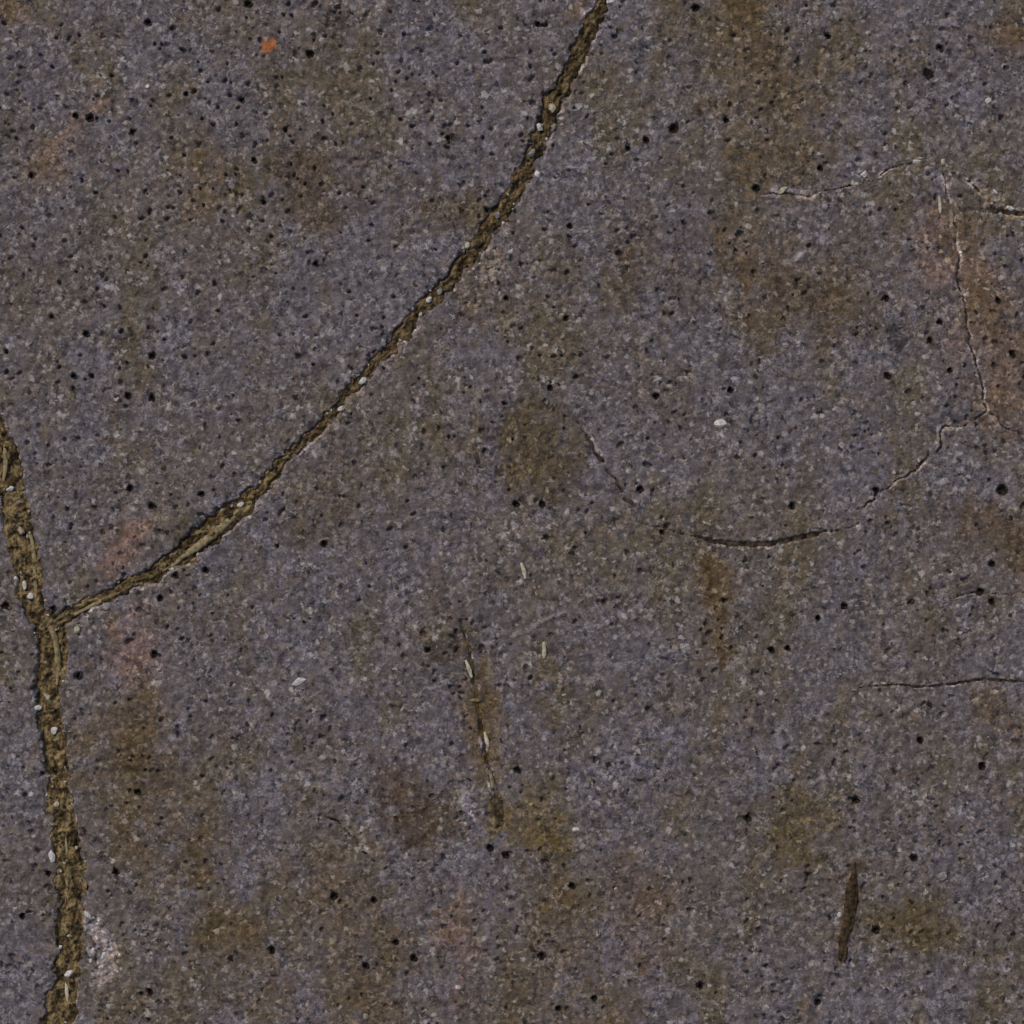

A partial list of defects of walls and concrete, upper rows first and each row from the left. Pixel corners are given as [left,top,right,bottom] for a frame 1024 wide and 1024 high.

crack [0,0,615,1024]
crack [577,156,1024,550]
crack [859,678,1024,690]